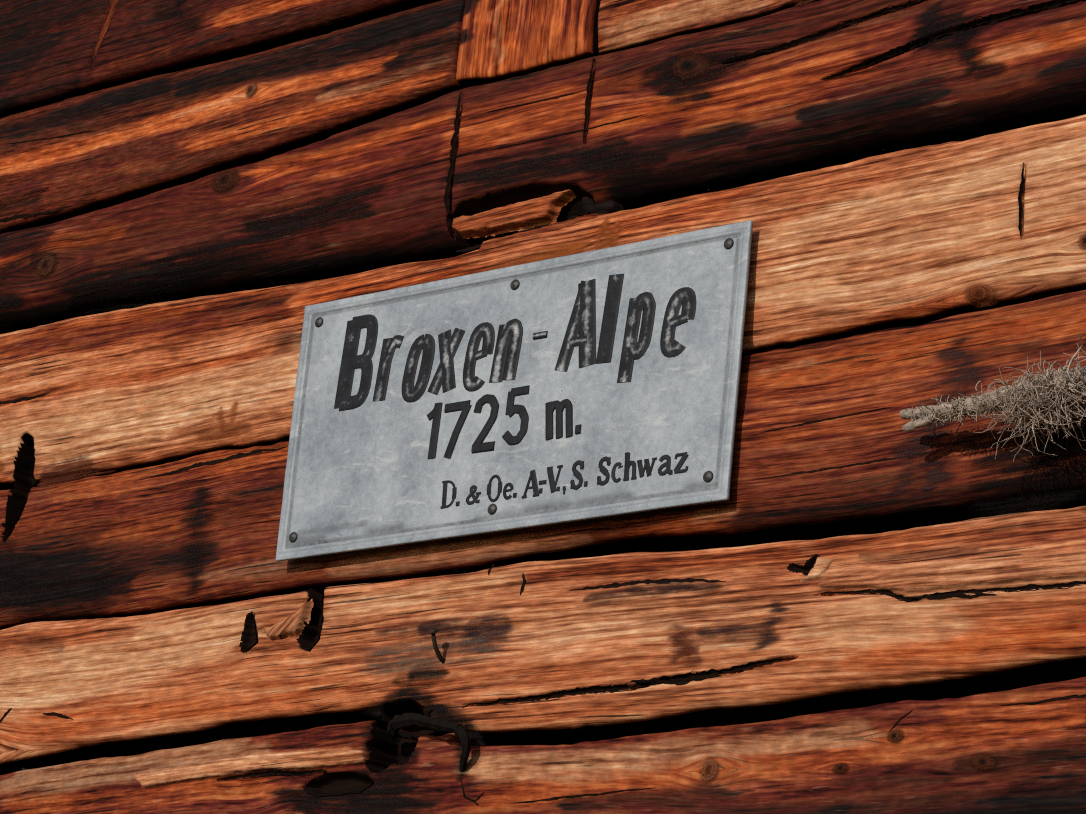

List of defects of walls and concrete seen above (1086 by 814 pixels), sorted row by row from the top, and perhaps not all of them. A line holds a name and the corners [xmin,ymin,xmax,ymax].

crack [1017,163,1025,238]
crack [815,581,1086,602]
crack [462,657,796,708]